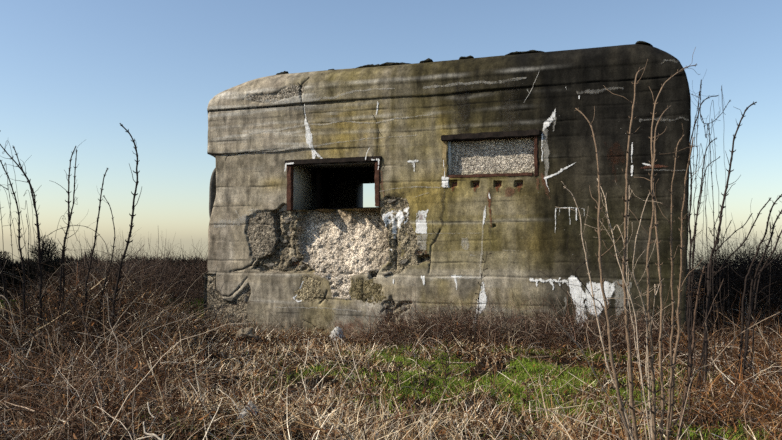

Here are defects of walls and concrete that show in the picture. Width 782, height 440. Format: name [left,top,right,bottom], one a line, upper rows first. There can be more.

damp [304,104,322,159]
damp [541,109,556,161]
damp [382,208,409,239]
spalling [245,196,430,335]
damp [474,282,487,323]
damp [529,276,615,333]